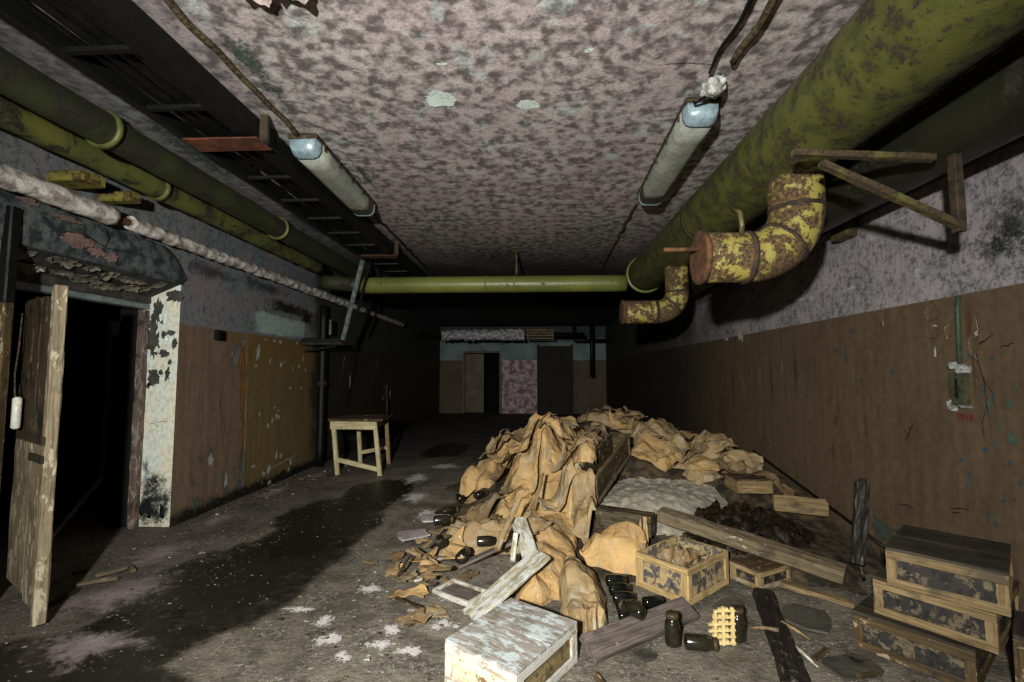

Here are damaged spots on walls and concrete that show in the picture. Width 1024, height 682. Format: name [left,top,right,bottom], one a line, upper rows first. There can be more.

peeling [424,90,457,107]
peeling [516,99,540,110]
peeling [17,213,183,389]
peeling [230,338,306,373]
crack [975,317,995,438]
water stain [0,442,468,682]